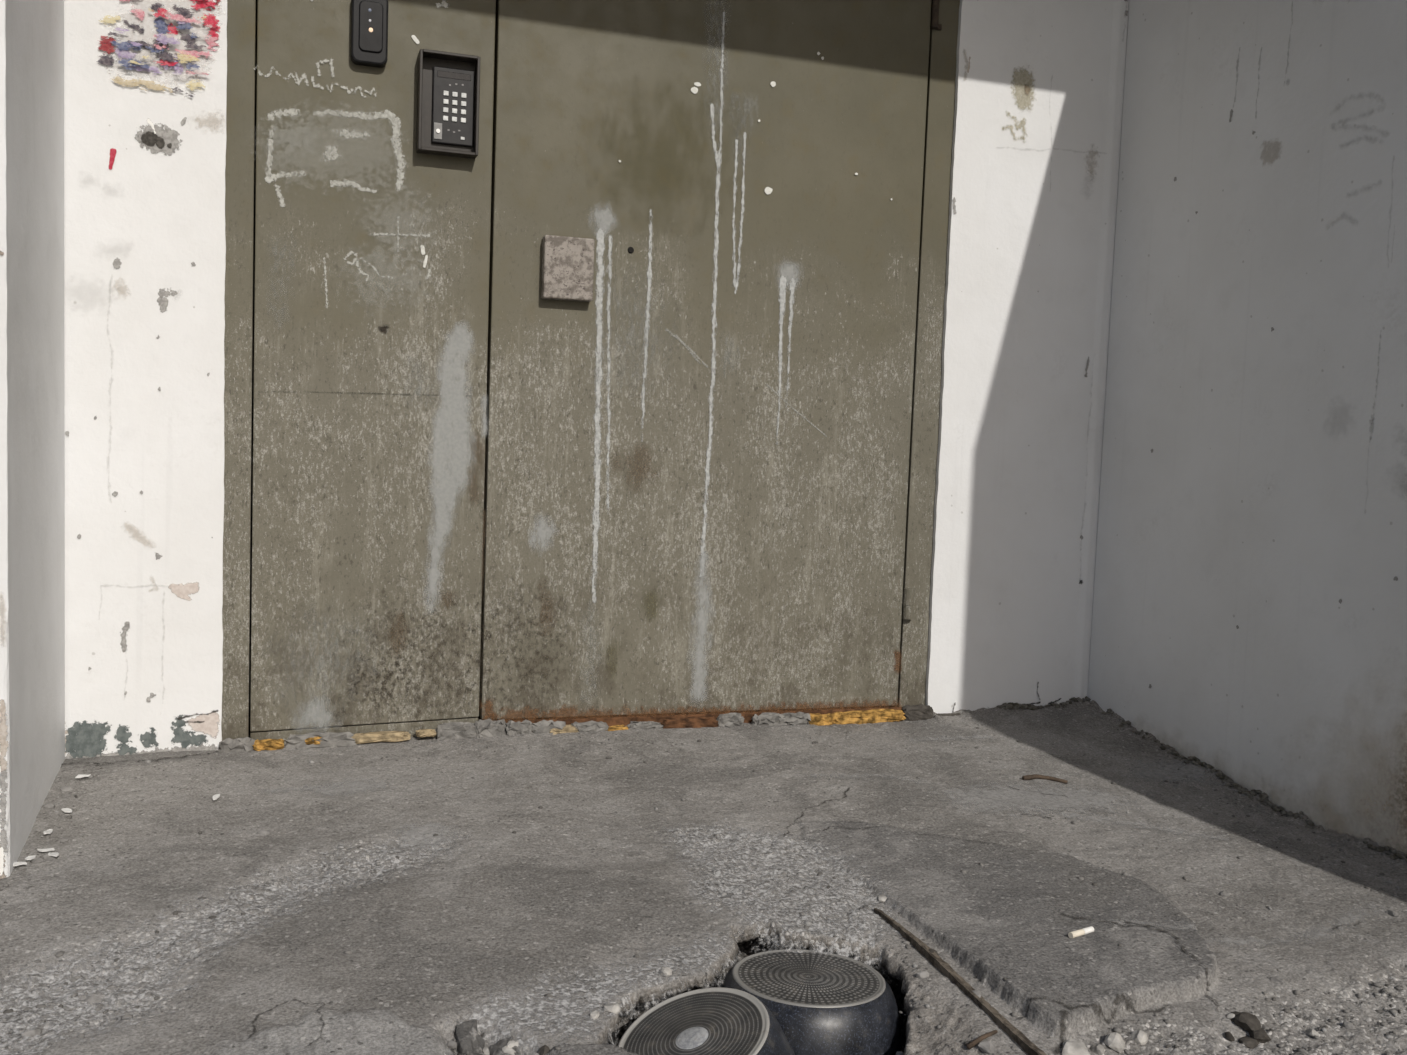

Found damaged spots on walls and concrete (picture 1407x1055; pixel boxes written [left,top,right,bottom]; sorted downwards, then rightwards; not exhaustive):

peeling [65,710,220,759]
rust [485,701,901,721]
spalling [0,699,8,879]
crack [1062,913,1220,1009]
crack [1019,994,1168,1054]